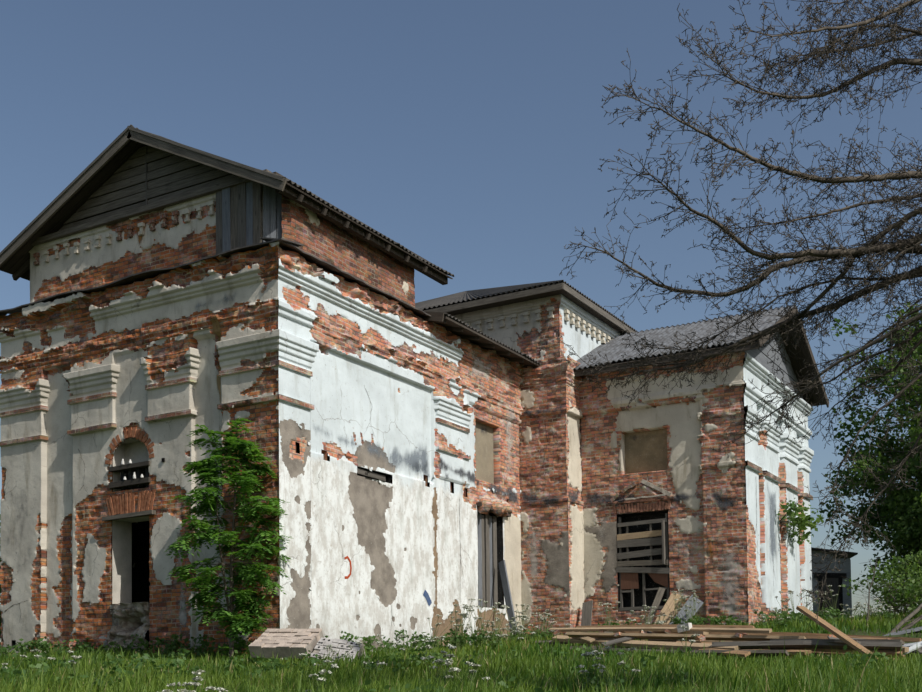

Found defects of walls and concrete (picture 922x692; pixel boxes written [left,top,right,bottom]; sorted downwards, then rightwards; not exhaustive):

spalling [0,200,567,656]
peeling [606,365,745,534]
peeling [540,504,619,611]